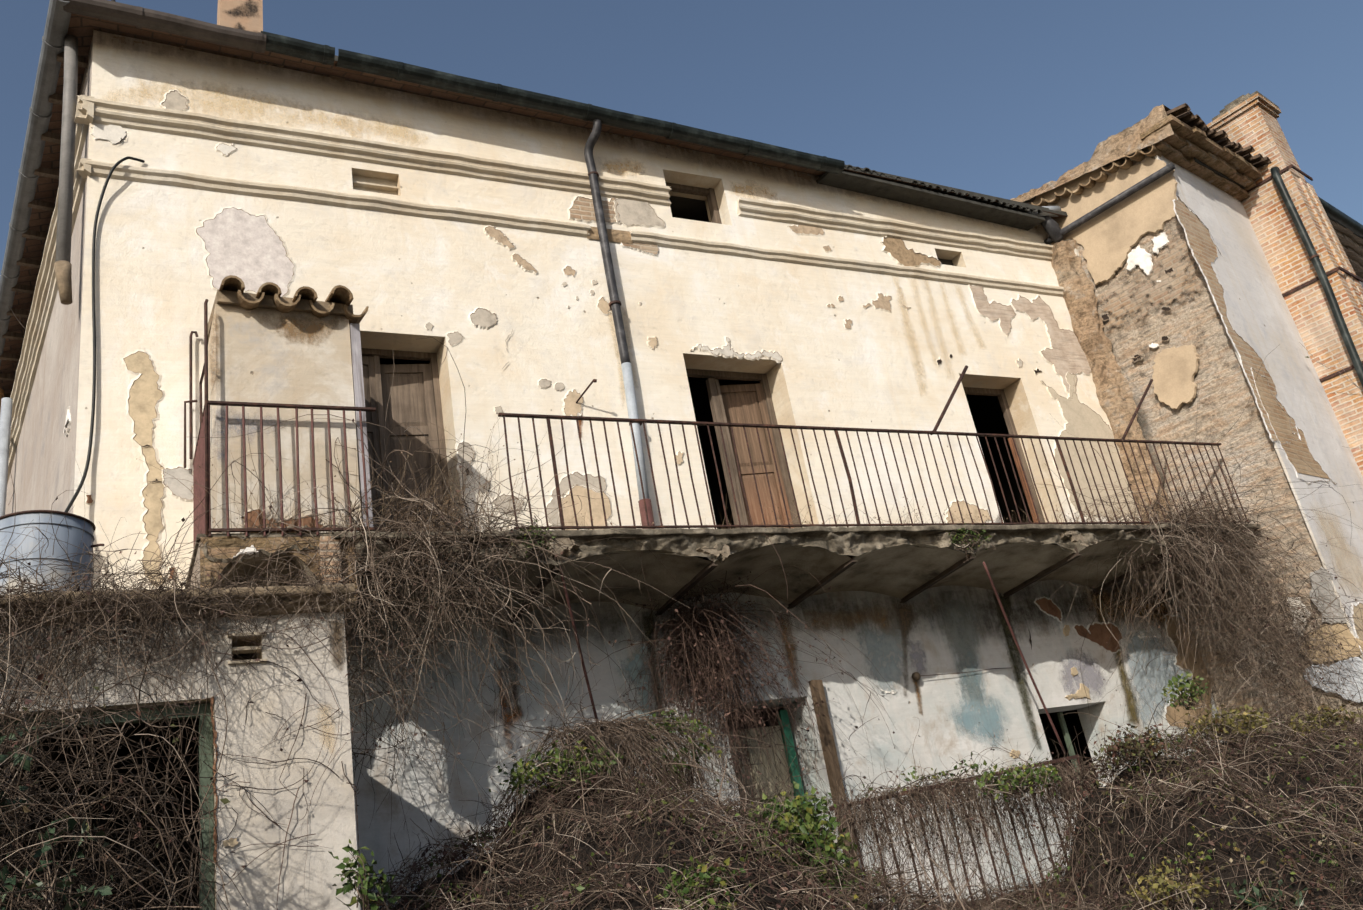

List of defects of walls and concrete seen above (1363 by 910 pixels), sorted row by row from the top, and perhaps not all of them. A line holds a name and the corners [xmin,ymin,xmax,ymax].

flaking render [195,206,296,297]
flaking render [567,195,666,257]
spalling [880,236,942,268]
flaking render [424,307,498,348]
flaking render [1033,157,1337,486]
flaking render [968,284,1140,550]
flaking render [122,349,193,588]
flaking render [544,470,613,560]
leakage [498,583,1184,700]
flaking render [1034,596,1123,654]
flaking render [1287,597,1363,664]
corrosion [492,672,522,747]